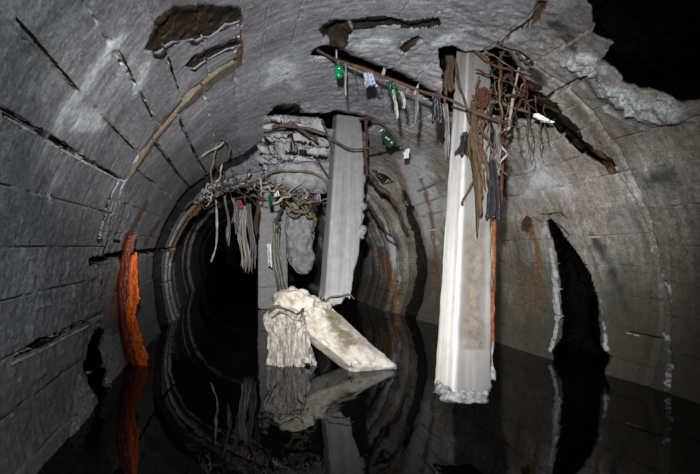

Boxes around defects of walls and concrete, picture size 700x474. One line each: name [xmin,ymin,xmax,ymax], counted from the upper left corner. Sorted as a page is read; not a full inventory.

spalling [147,4,244,71]
spalling [318,16,441,53]
damp [31,34,127,185]
damp [132,60,151,97]
crack [496,1,659,257]
damp [558,34,683,132]
rust [521,215,544,276]
rust [108,201,159,366]
rust [377,247,403,311]
spalling [97,328,124,384]
crack [626,330,674,388]
spalling [69,371,94,436]